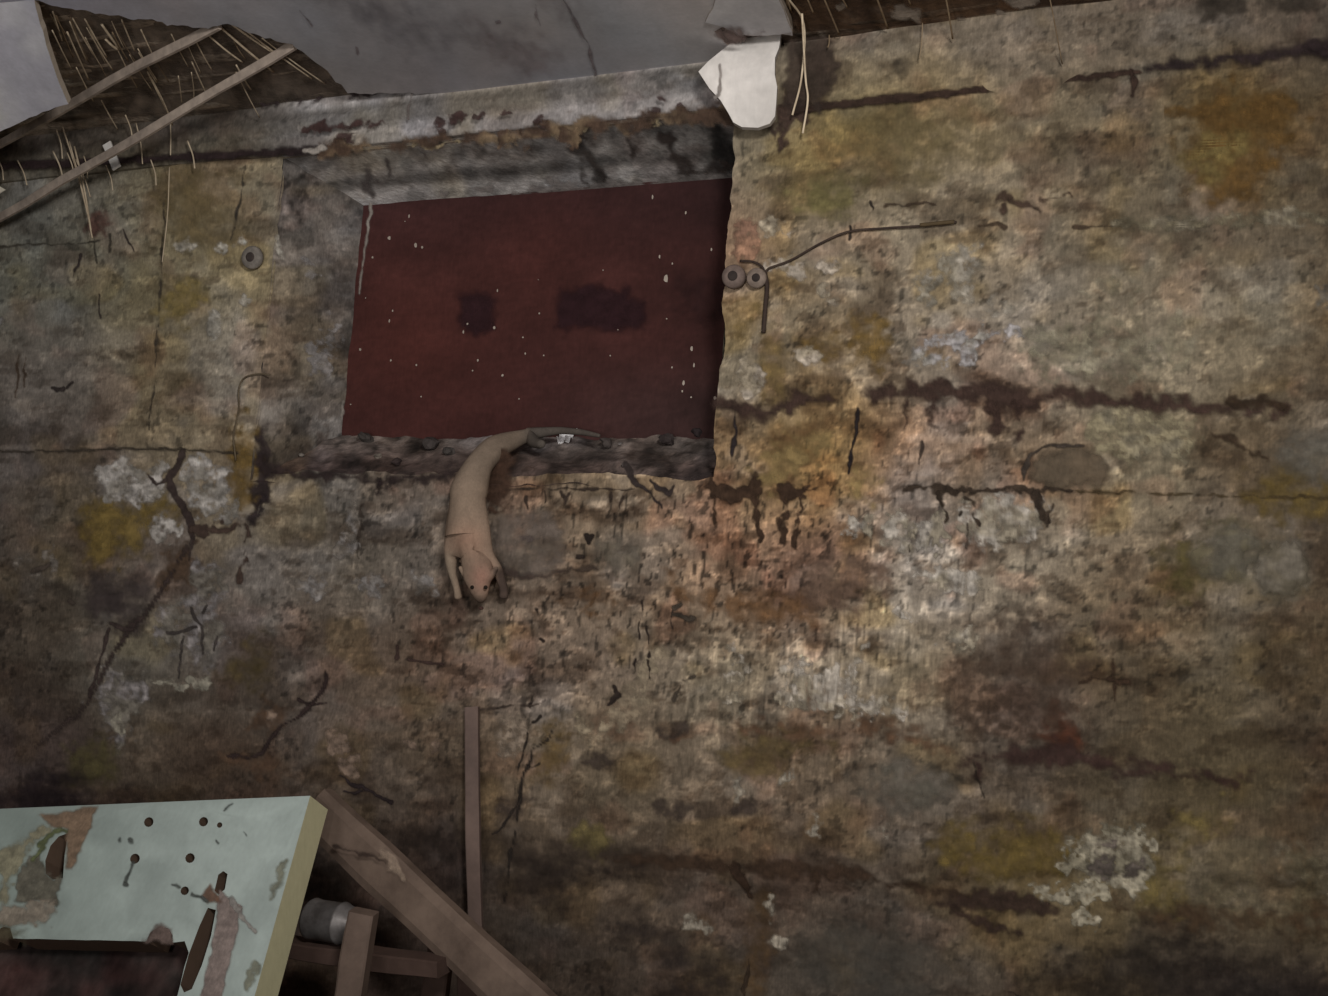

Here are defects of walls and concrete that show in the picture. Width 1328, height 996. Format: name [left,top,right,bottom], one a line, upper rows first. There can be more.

spalling [786,0,1111,64]
leakage [1199,0,1245,18]
crack [0,210,251,745]
crack [227,671,328,759]